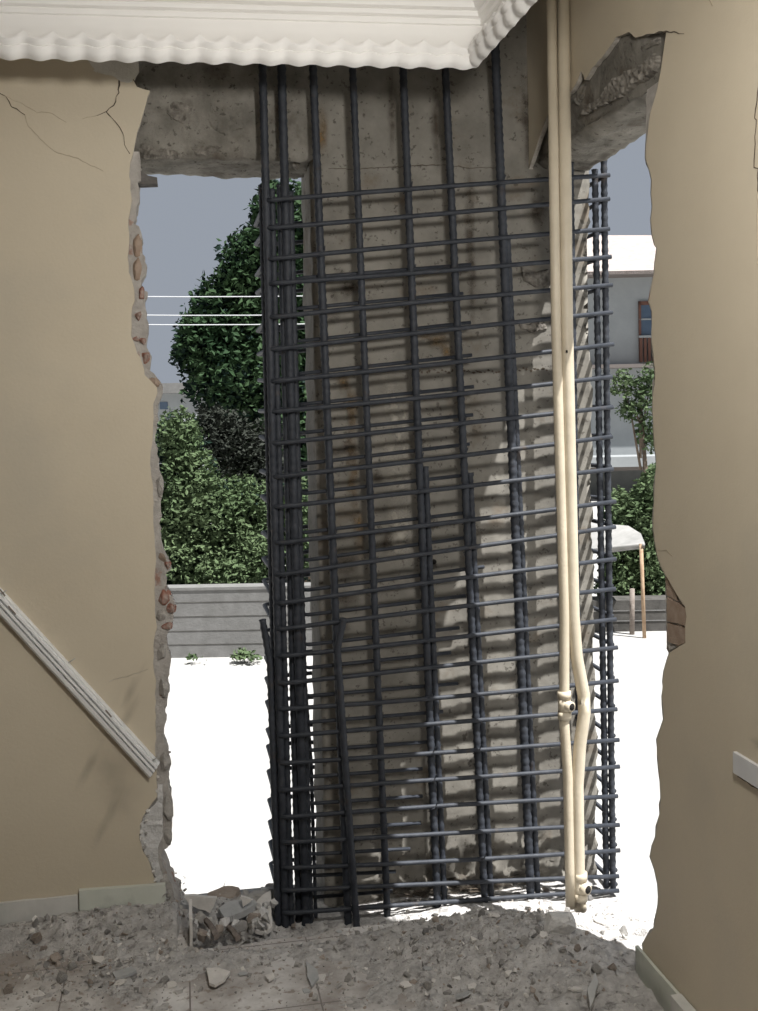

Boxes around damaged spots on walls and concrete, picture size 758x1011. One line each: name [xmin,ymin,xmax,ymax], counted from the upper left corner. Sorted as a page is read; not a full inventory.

spalling [574,37,662,116]
crack [0,79,137,171]
crack [750,89,758,265]
flaking render [133,234,145,299]
flaking render [132,336,150,364]
flaking render [156,475,164,497]
flaking render [156,590,176,629]
flaking render [159,679,170,697]
spalling [139,751,174,899]